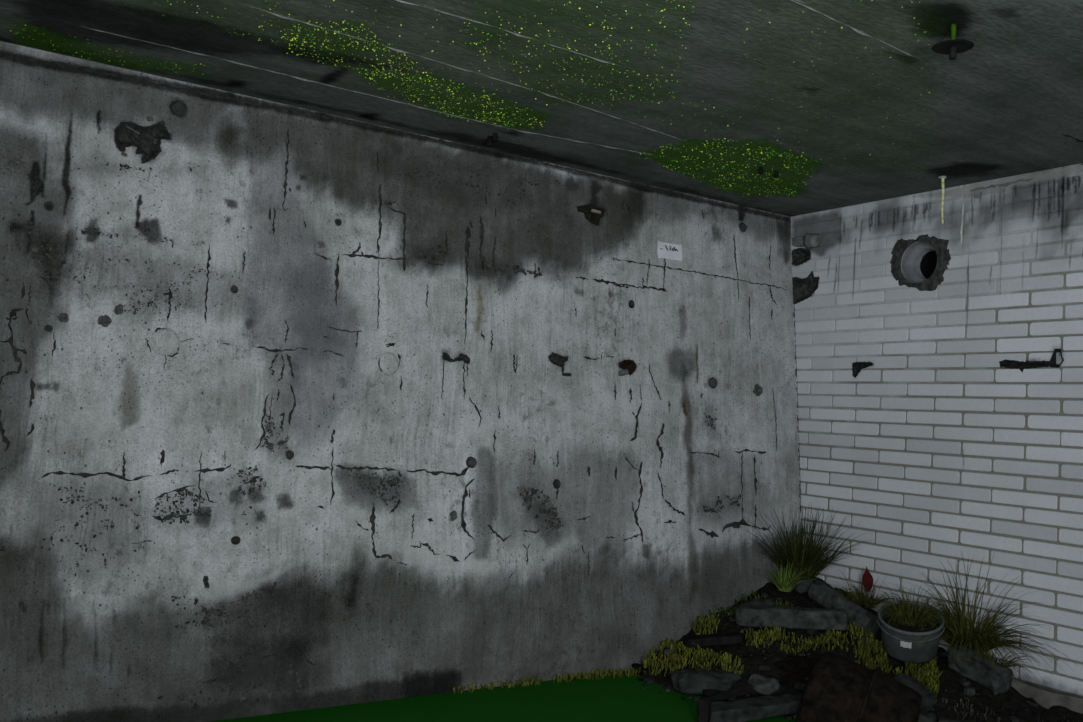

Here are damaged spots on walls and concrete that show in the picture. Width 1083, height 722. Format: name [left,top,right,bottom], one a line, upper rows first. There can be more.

spalling [106,116,171,171]
damp [0,0,839,286]
damp [934,164,997,243]
damp [1001,167,1083,230]
crack [221,152,536,452]
spalling [791,248,820,304]
spalling [548,352,571,376]
spalling [618,359,637,376]
crack [576,236,801,575]
crack [41,450,262,544]
crack [296,429,539,577]
damp [0,542,813,722]